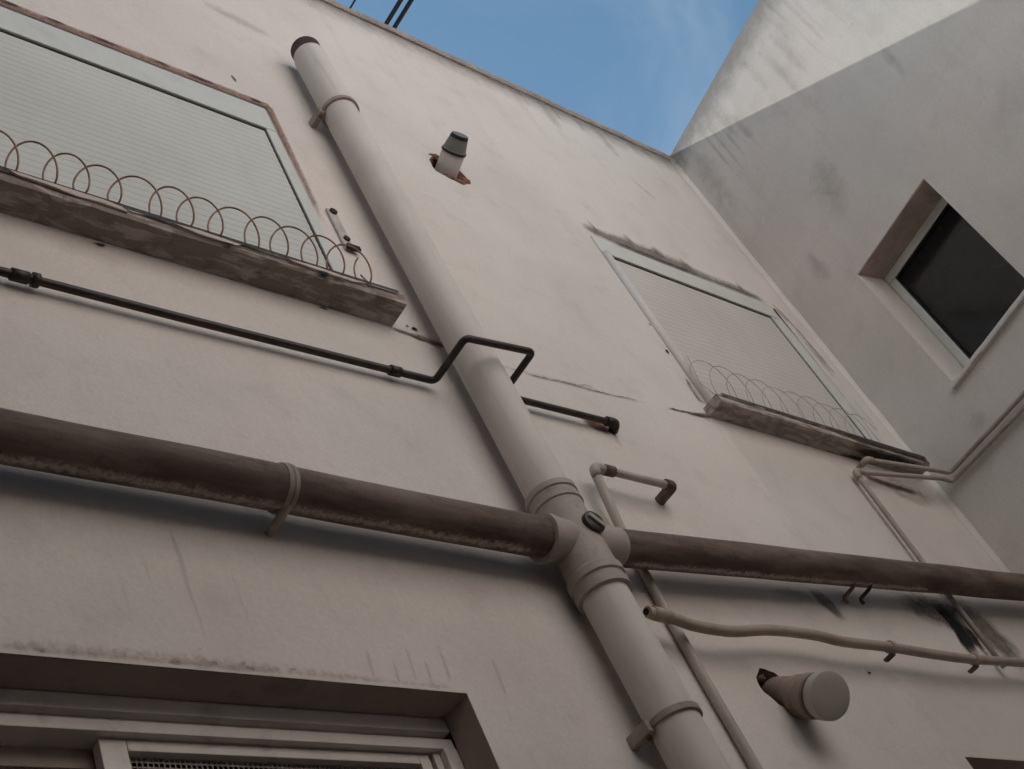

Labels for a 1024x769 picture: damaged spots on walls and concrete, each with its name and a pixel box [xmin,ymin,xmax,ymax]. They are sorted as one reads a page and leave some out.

flaking render [429,153,471,185]
crack [505,366,641,402]
crack [671,408,710,421]
damp [908,596,1019,658]